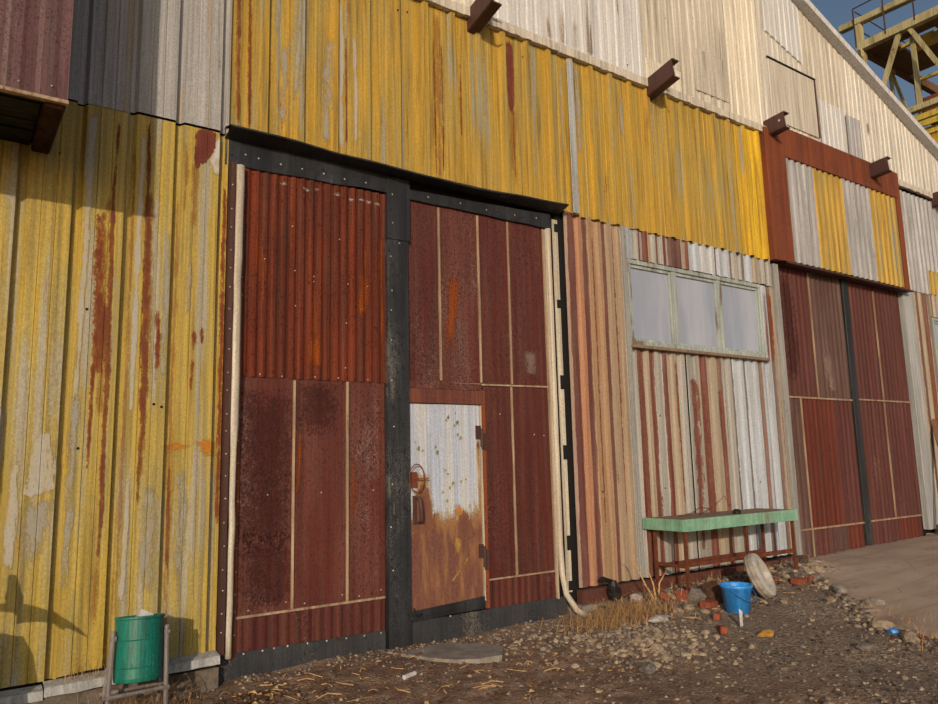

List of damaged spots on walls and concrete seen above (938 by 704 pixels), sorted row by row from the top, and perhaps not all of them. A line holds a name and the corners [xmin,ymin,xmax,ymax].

corrosion [194,129,216,168]
corrosion [506,42,516,176]
peeling [0,115,98,587]
corrosion [86,123,121,558]
corrosion [136,124,161,501]
corrosion [446,278,458,340]
corrosion [675,361,686,502]
peeling [411,469,484,611]